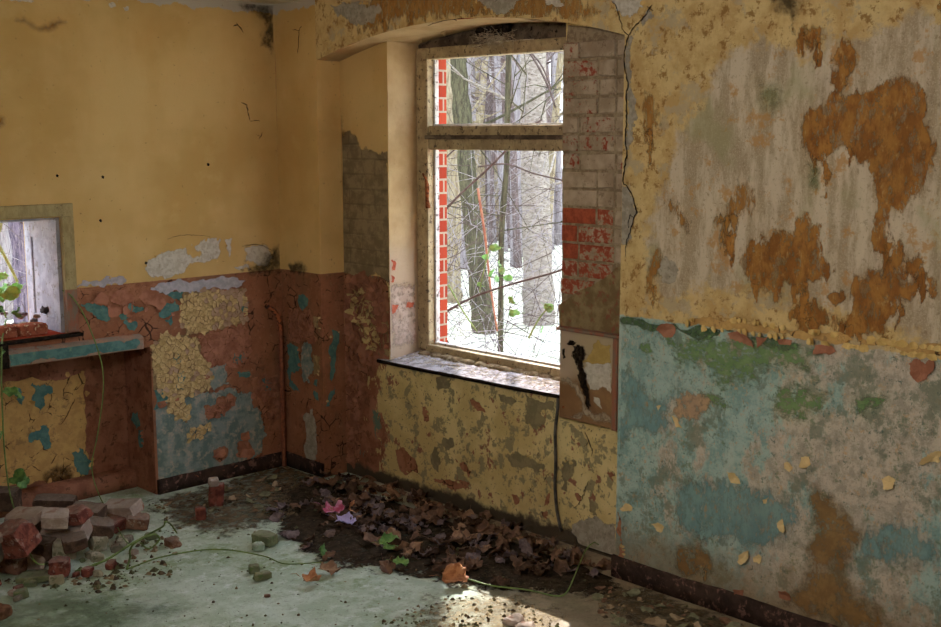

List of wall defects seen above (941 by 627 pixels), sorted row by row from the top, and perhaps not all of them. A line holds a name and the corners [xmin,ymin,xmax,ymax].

crack [614,3,653,256]
flaking render [559,0,654,409]
peeling [0,238,274,486]
flaking render [286,130,416,469]
peeling [656,316,941,382]
peeling [396,447,419,476]
peeling [431,437,471,490]
peeling [504,451,545,473]
peeling [498,394,555,431]
flaking render [541,459,633,558]
peeling [737,551,761,565]
leakage [784,488,882,627]